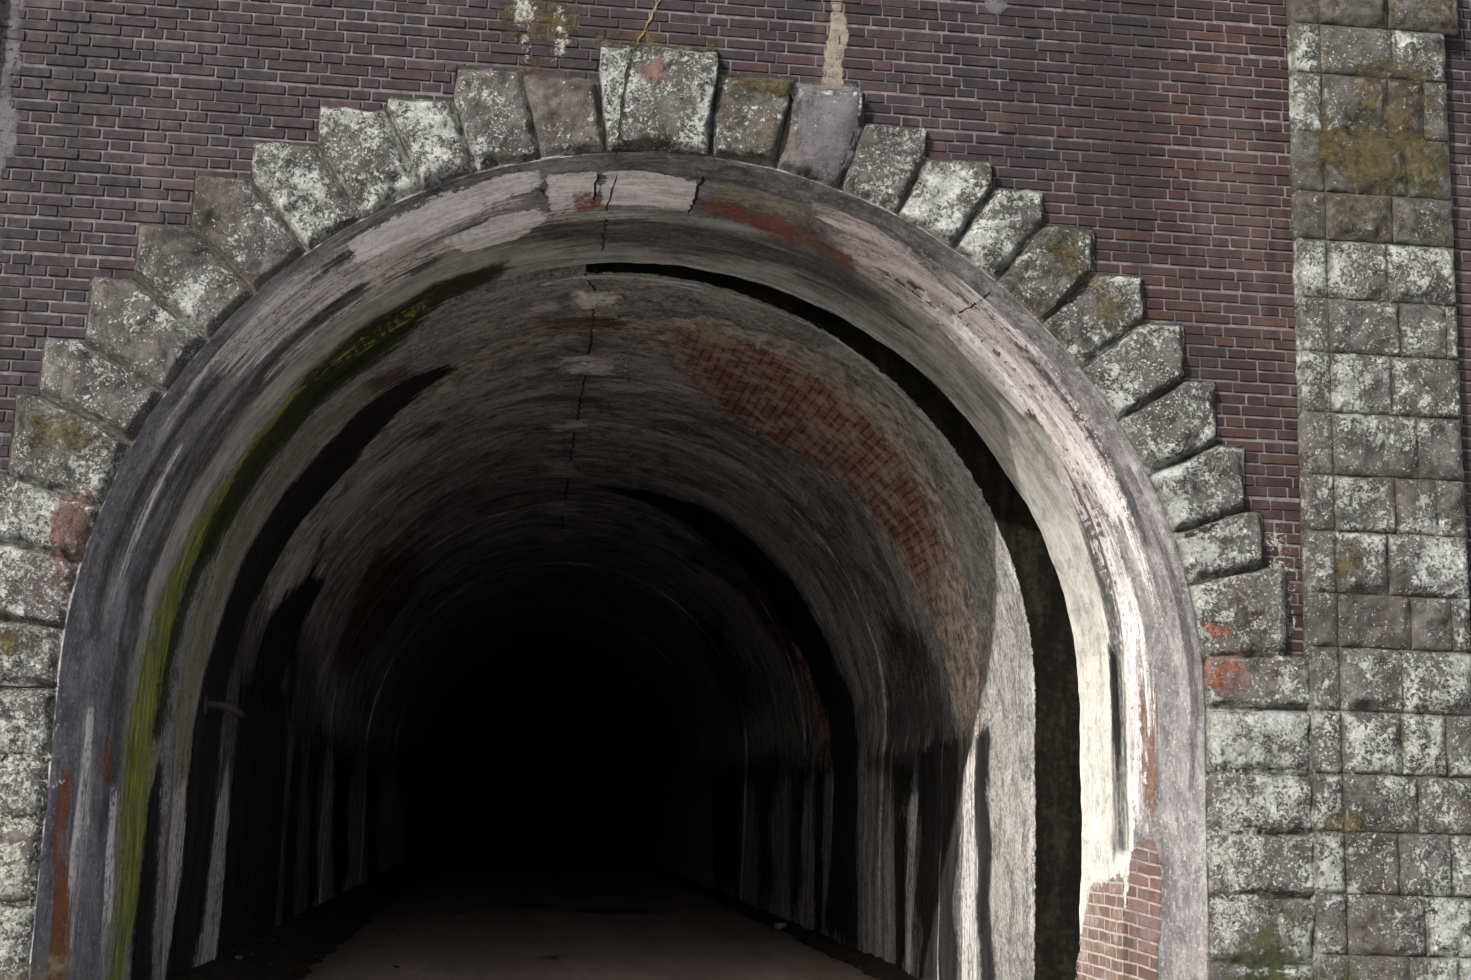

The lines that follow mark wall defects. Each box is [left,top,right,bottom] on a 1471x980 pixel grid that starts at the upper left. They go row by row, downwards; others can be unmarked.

crack [532,0,660,542]
crack [688,176,705,213]
damp [68,197,1198,980]
peeling [264,170,1165,980]
corrosion [48,776,72,980]